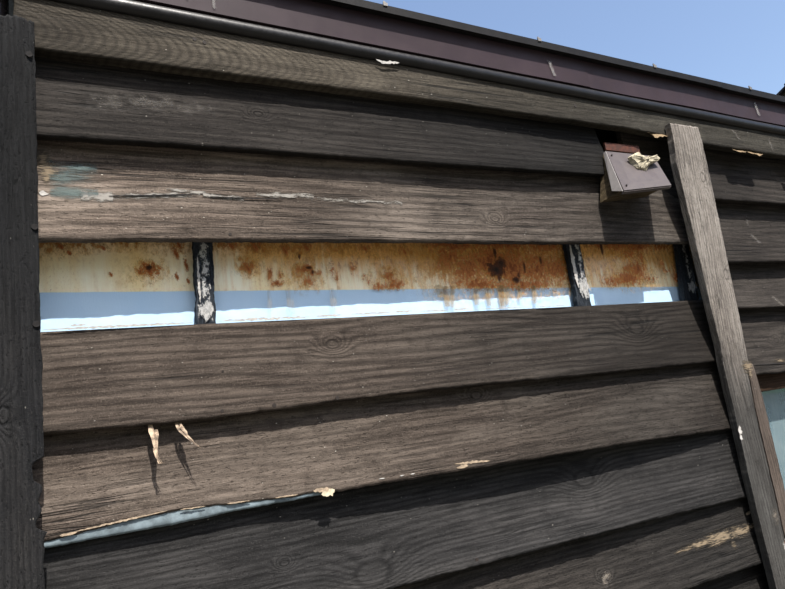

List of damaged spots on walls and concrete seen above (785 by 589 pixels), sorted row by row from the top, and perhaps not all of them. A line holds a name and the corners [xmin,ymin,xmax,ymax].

rust [135,261,161,279]
rust [164,243,190,283]
rust [215,242,569,306]
rust [586,244,677,288]